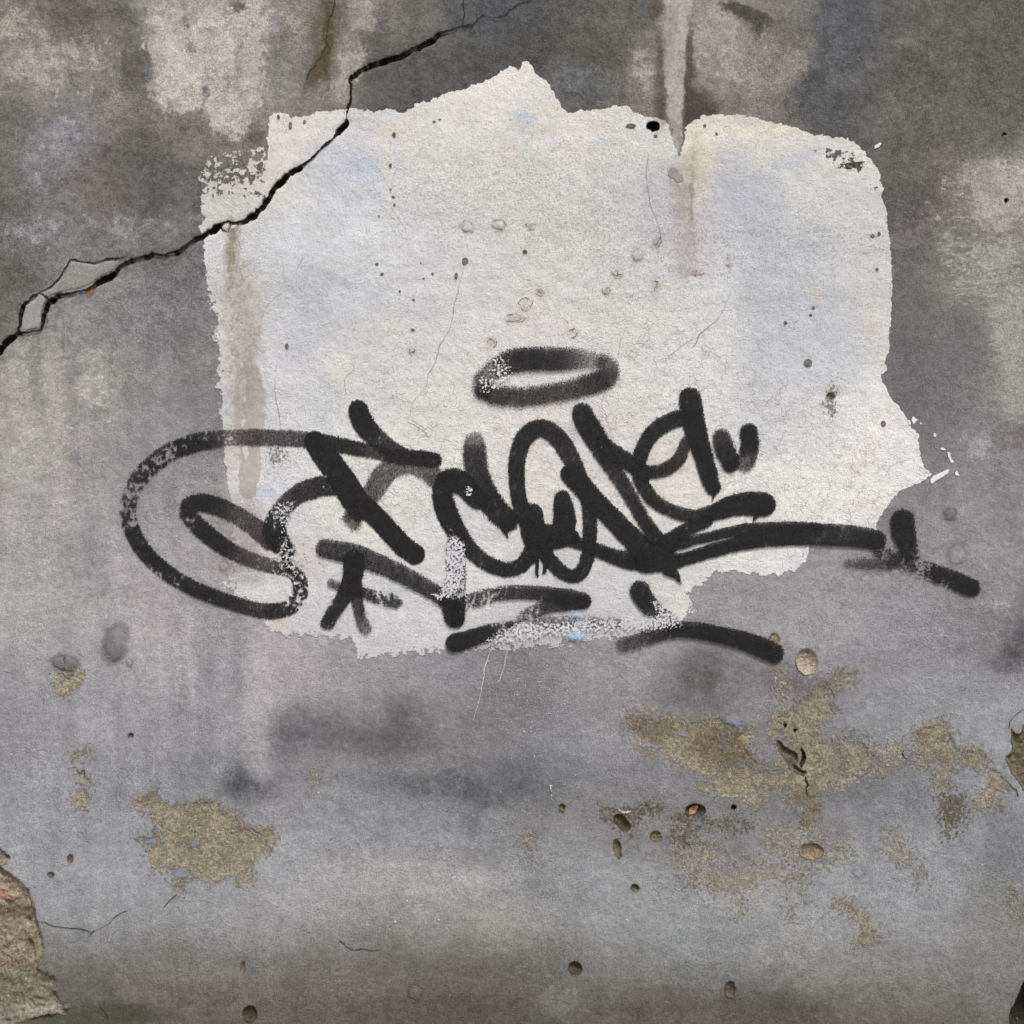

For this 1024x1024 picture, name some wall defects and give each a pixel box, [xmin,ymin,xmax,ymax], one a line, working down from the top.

damp [650,0,714,156]
crack [0,0,530,354]
damp [224,227,256,338]
crack [408,268,464,437]
peeling [48,666,86,702]
peeling [132,779,281,903]
peeling [591,648,1024,957]
spalling [0,847,67,1024]